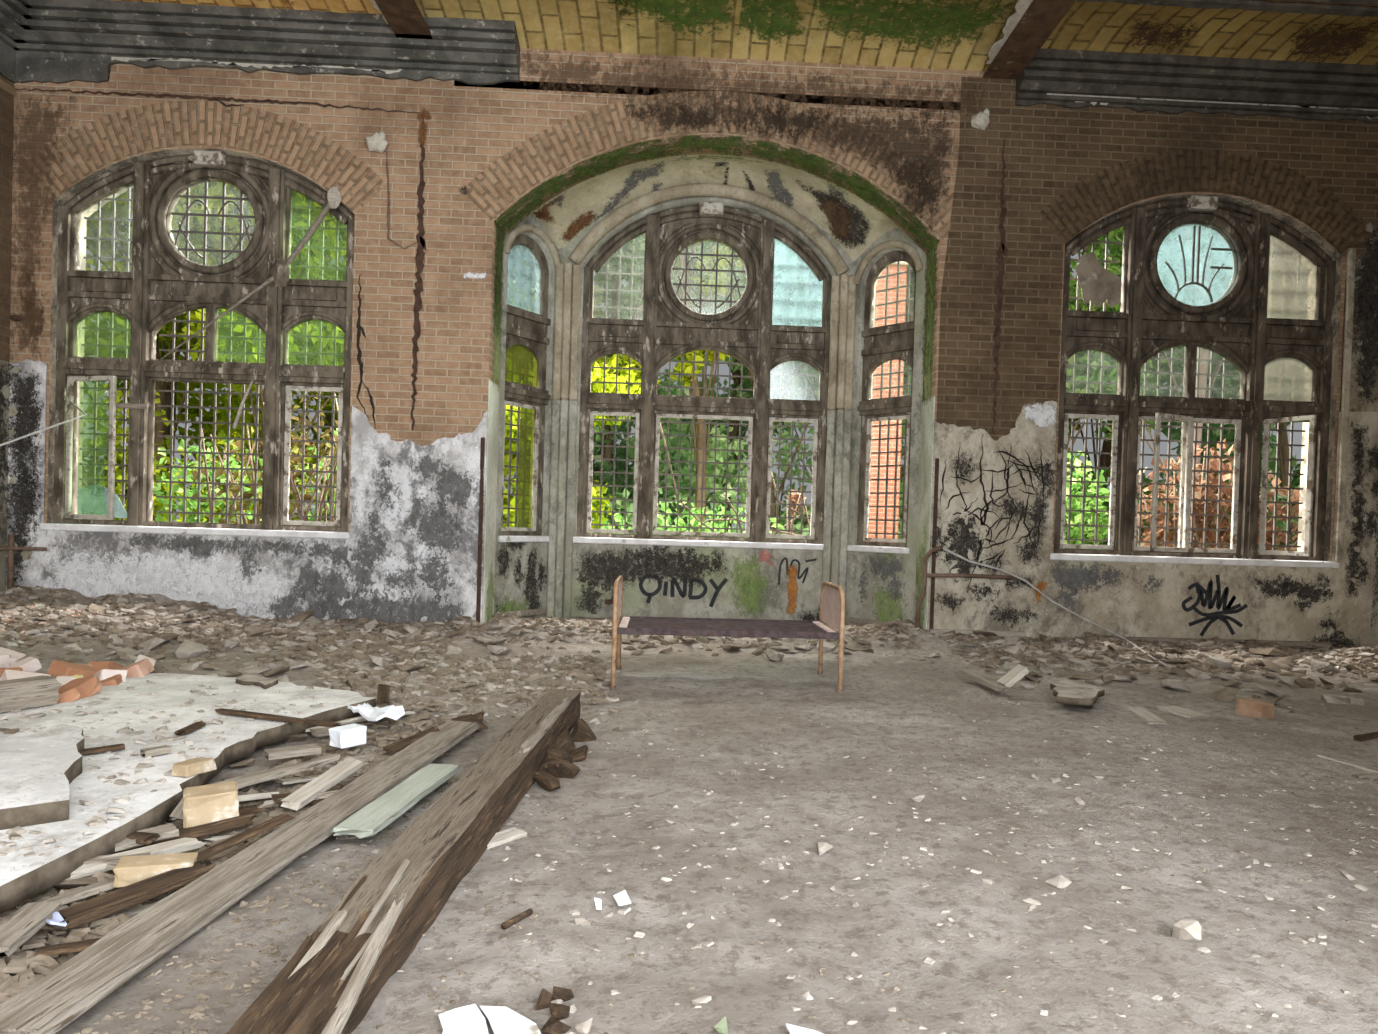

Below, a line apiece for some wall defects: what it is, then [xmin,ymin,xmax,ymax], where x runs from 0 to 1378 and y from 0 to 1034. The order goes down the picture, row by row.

leakage [1124,16,1198,52]
leakage [1287,19,1378,63]
peeling [533,161,664,241]
flaking render [764,170,871,249]
leakage [898,156,938,225]
crack [356,274,375,424]
leakage [352,436,449,578]
leakage [466,468,484,510]
leakage [45,533,357,619]